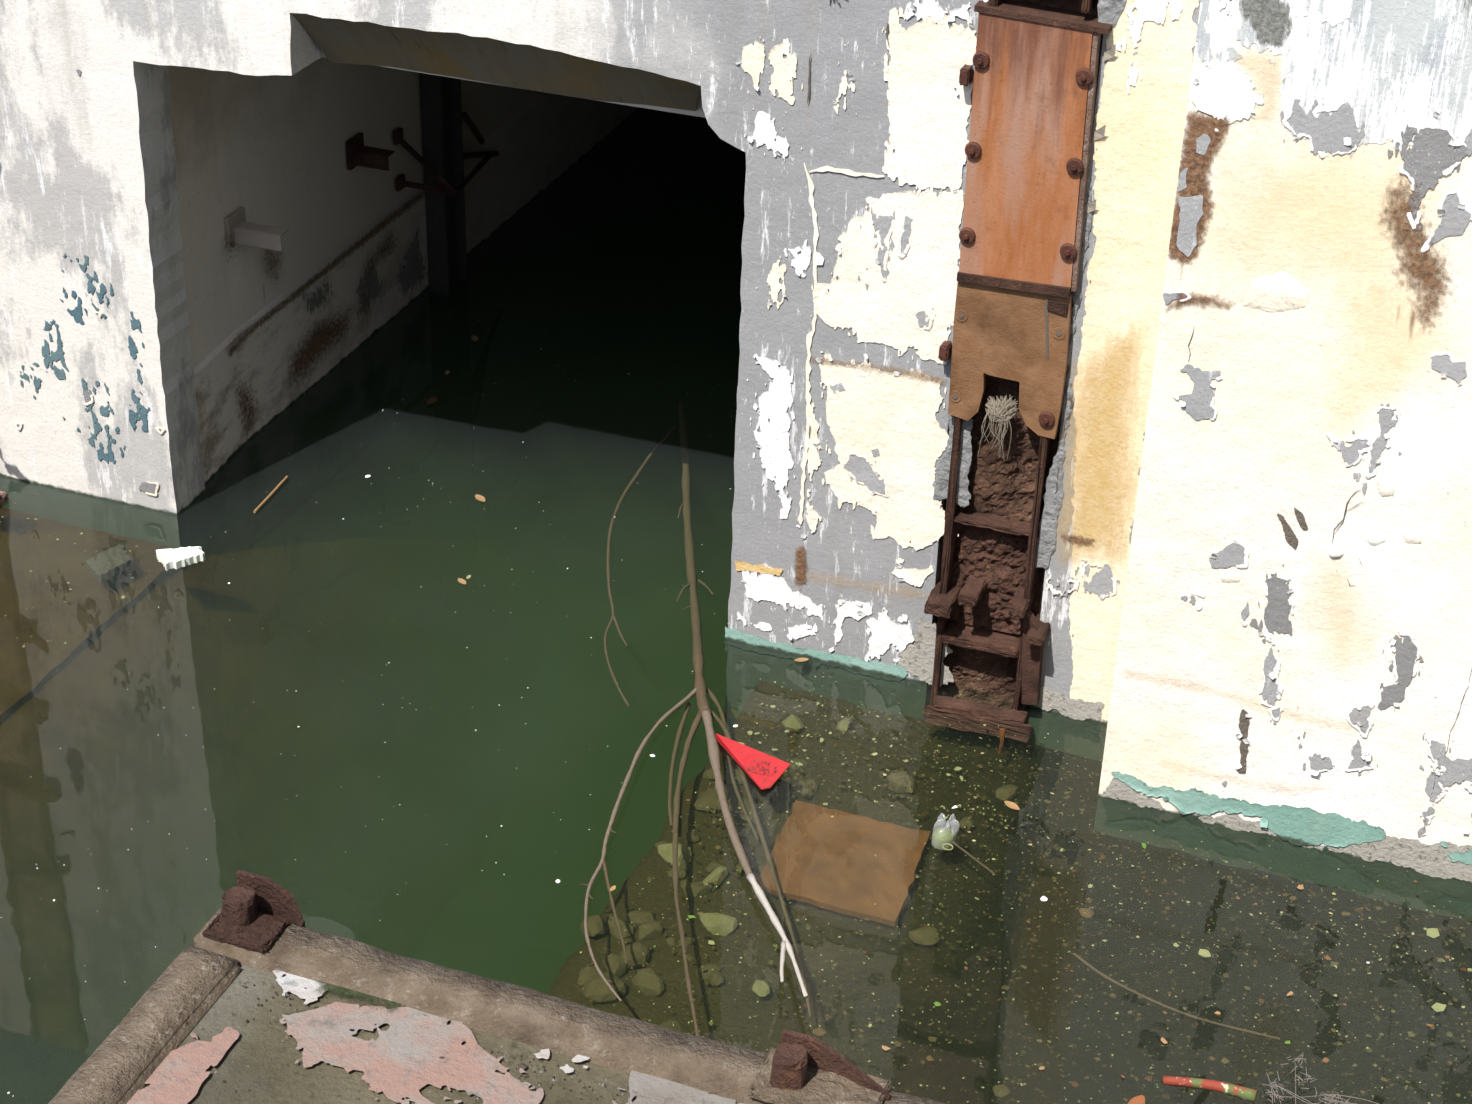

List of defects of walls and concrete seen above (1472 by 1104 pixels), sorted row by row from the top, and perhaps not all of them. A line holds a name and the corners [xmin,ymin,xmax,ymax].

peeling [734,38,803,161]
corrosion [229,190,424,384]
peeling [747,0,988,587]
corrosion [1169,113,1229,263]
corrosion [1383,181,1450,326]
damp [1073,345,1130,550]
peeling [1035,0,1472,865]
corrosion [1062,535,1094,545]
peeling [723,563,914,682]
peeling [126,1026,240,1104]
peeling [267,967,544,1104]
peeling [612,1070,745,1104]